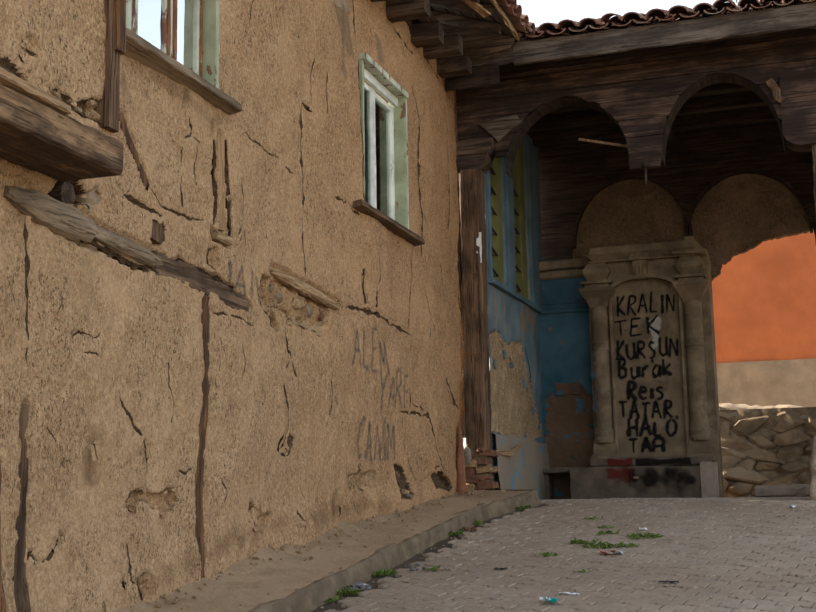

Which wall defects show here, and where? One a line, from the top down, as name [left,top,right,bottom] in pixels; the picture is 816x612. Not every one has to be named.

spalling [0,34,42,78]
spalling [51,88,101,124]
crack [122,55,330,277]
crack [18,214,34,368]
crack [80,240,151,272]
spalling [258,270,329,337]
crack [346,82,427,351]
crack [110,377,151,476]
crack [279,329,298,457]
peeling [489,329,594,499]
spalling [125,487,179,517]
spalling [394,464,415,499]